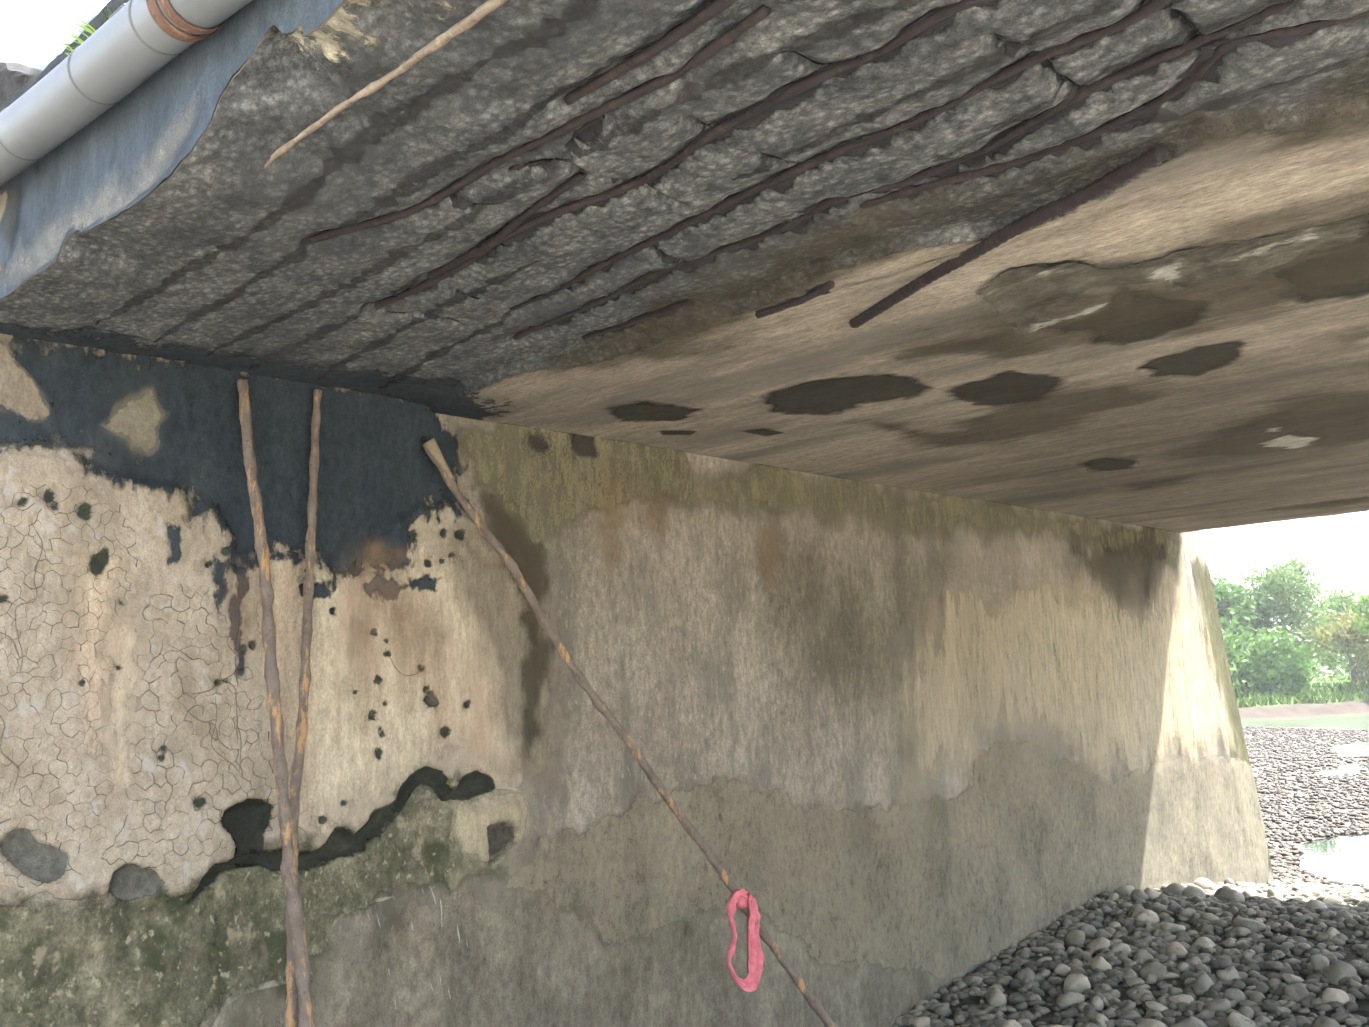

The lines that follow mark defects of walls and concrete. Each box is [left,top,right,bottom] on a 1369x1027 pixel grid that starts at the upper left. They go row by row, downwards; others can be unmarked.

crack [2,438,54,446]
leakage [0,336,553,786]
leakage [569,433,597,458]
leakage [607,401,701,435]
spalling [0,0,1369,545]
leakage [765,205,1369,446]
leakage [1079,458,1182,488]
leakage [1180,393,1369,458]
crack [0,484,339,888]
peeling [0,441,527,1027]
leakage [227,463,1270,1027]